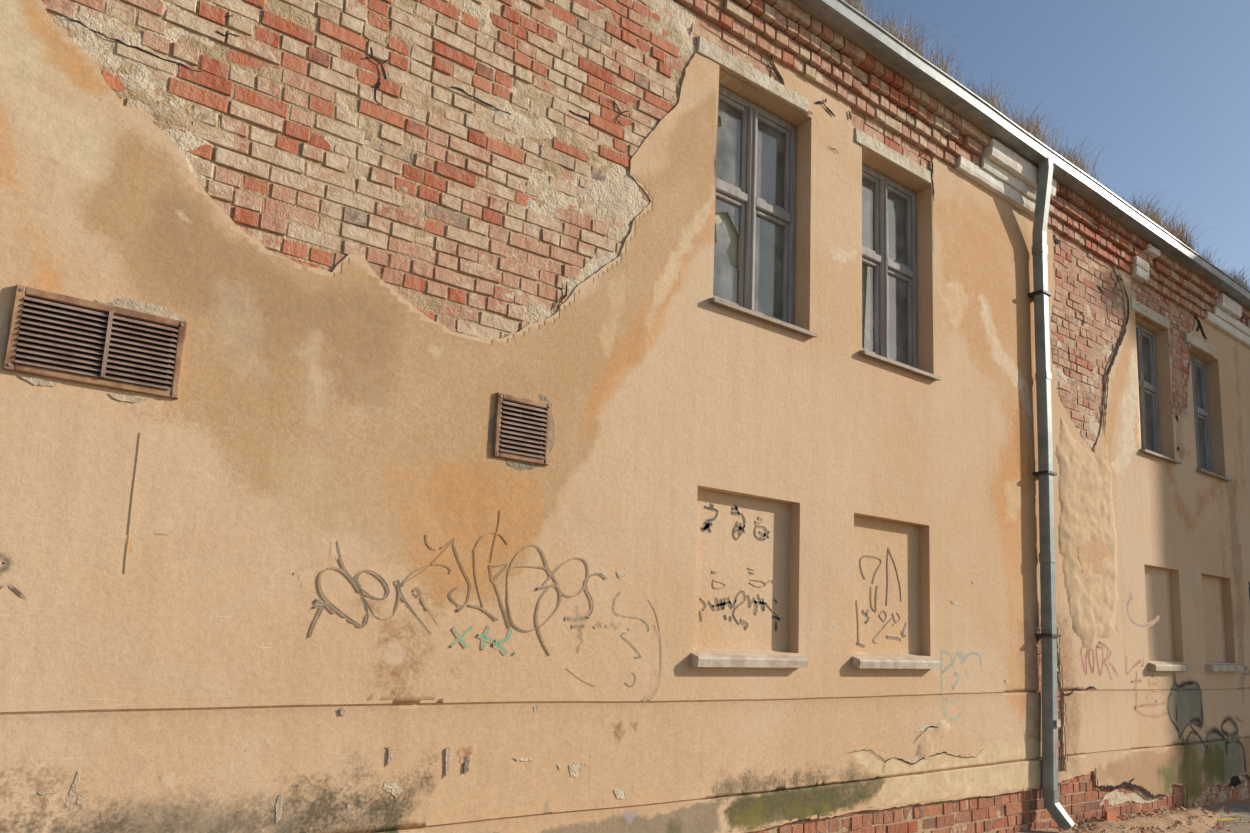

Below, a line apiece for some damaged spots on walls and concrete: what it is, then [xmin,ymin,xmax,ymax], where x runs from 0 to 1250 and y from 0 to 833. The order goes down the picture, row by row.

crack [46,9,202,72]
crack [362,32,388,110]
flaking render [42,0,782,339]
flaking render [20,376,62,387]
leakage [0,0,716,709]
crack [1078,267,1129,435]
flaking render [1050,230,1195,450]
leakage [1161,338,1250,709]
leakage [0,721,442,833]
peeling [538,788,722,833]
leakage [704,754,882,809]
flaking render [749,656,1250,833]